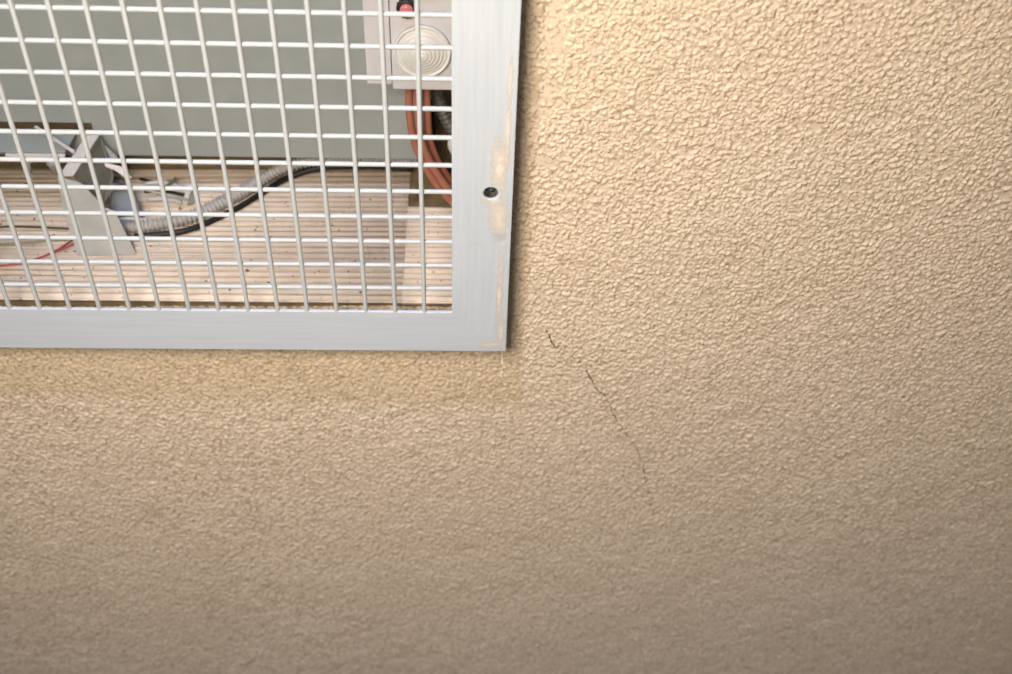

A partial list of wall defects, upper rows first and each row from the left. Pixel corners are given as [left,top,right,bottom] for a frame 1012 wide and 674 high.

crack [544,328,654,515]